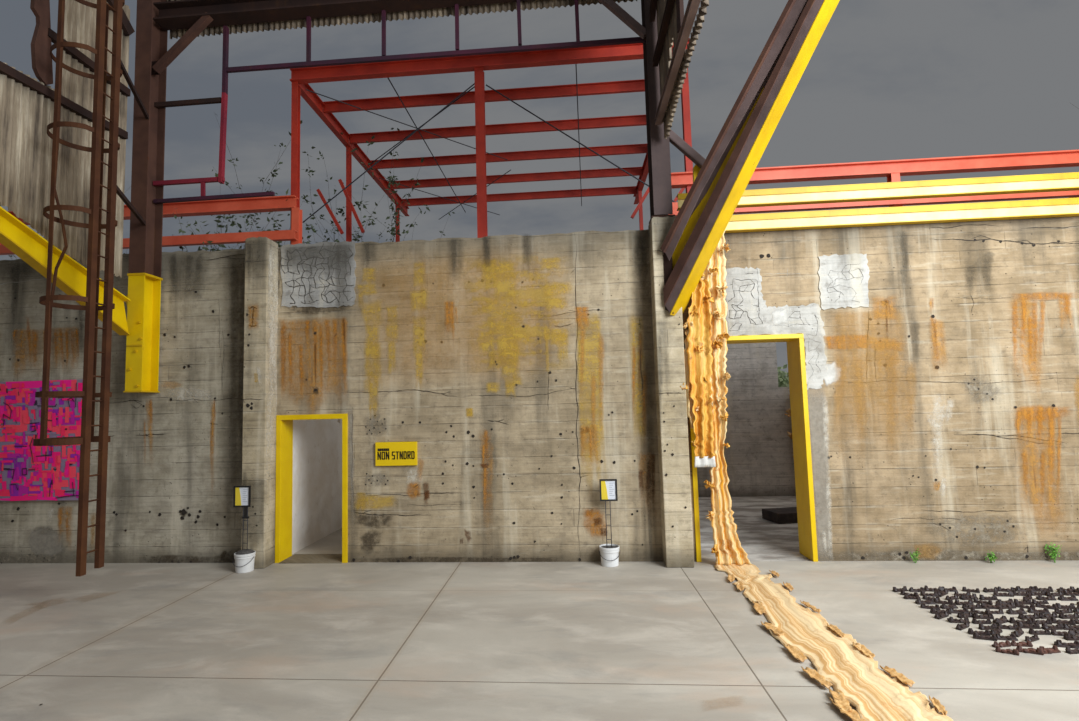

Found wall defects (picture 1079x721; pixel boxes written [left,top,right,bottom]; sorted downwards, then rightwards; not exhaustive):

corrosion [282,321,347,405]
crack [349,240,590,557]
corrosion [577,307,602,458]
crack [827,264,1078,385]
corrosion [1014,404,1061,509]
corrosion [1014,293,1070,371]